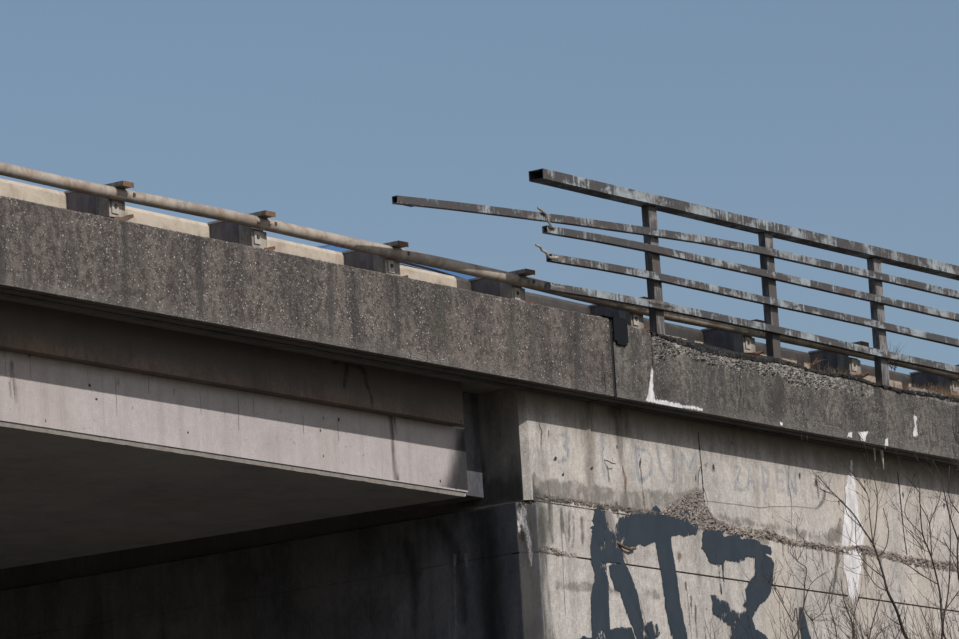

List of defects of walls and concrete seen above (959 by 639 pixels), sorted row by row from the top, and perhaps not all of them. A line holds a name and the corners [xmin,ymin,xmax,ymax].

spalling [651,333,874,397]
spalling [909,387,959,406]
spalling [517,475,957,573]